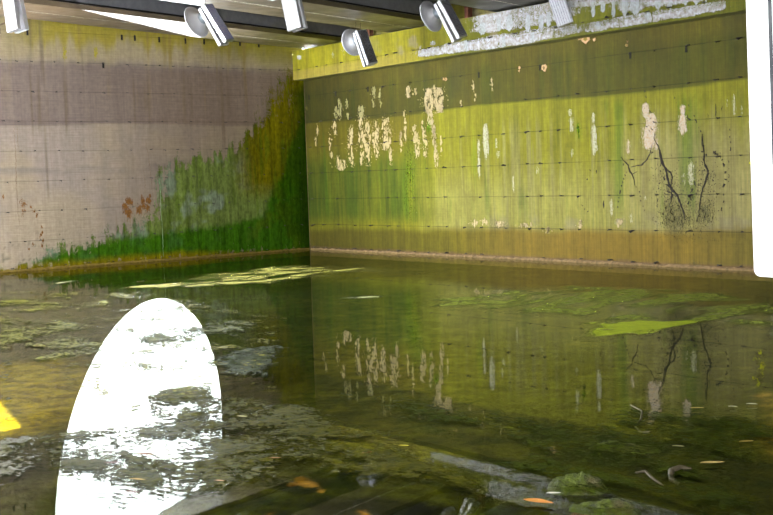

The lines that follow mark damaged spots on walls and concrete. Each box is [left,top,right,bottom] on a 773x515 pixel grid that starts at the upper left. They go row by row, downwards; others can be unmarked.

corrosion [122,194,152,222]
peeling [328,77,448,171]
crack [582,90,731,233]
water stain [652,163,716,242]